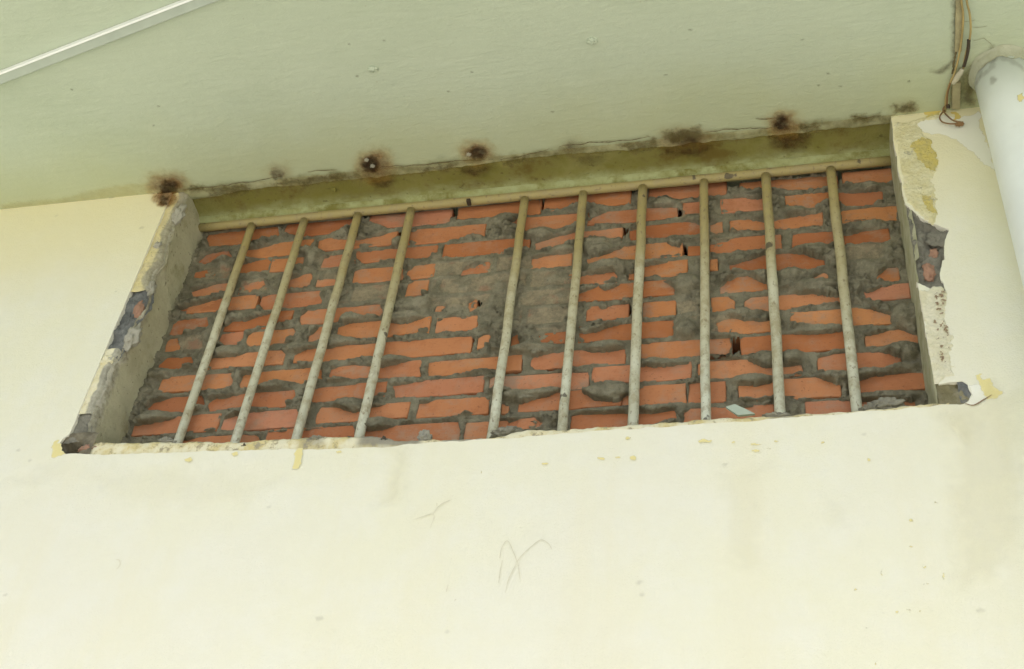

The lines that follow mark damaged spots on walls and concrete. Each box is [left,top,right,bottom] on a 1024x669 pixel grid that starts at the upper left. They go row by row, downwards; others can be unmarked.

rust [774,116,809,148]
rust [362,153,390,186]
rust [463,145,486,175]
rust [152,177,183,205]
spalling [51,111,1003,469]